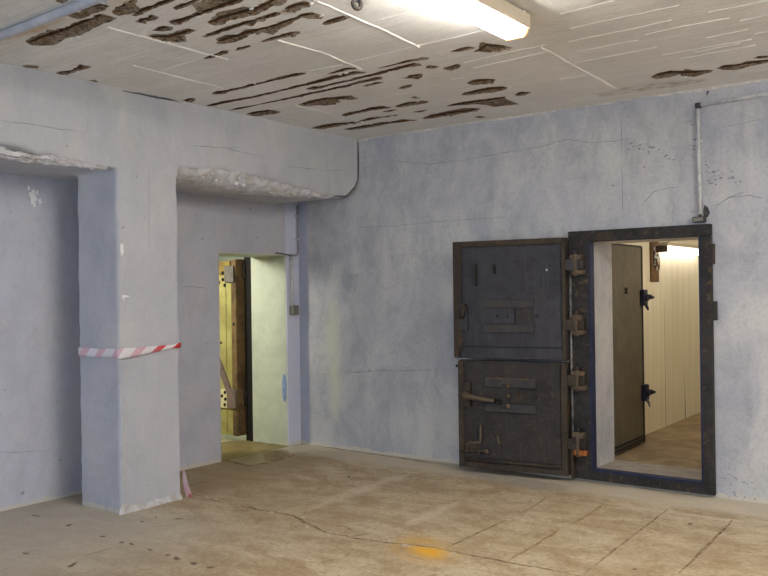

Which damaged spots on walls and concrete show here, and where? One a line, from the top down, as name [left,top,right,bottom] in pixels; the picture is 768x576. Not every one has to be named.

spalling [26,0,350,59]
spalling [56,64,91,75]
peeling [207,55,768,142]
spalling [0,146,108,170]
spalling [176,167,328,198]
crack [290,127,650,199]
crack [707,192,761,212]
crack [189,480,579,576]